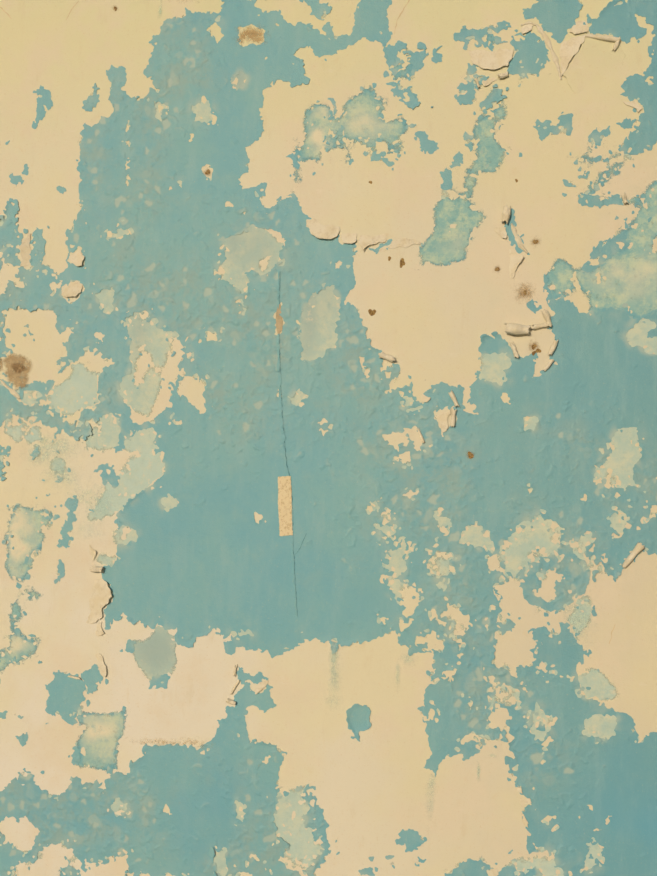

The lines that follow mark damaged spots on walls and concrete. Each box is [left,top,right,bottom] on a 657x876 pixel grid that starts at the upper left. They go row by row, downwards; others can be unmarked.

peeling [299,0,332,20]
peeling [414,131,439,154]
peeling [9,164,29,185]
peeling [578,190,629,208]
peeling [581,216,633,273]
crack [276,271,307,617]
peeling [0,445,11,481]
peeling [94,463,131,488]
peeling [42,495,78,548]
peeling [45,653,109,726]
peeling [149,673,171,689]
peeling [498,858,545,876]